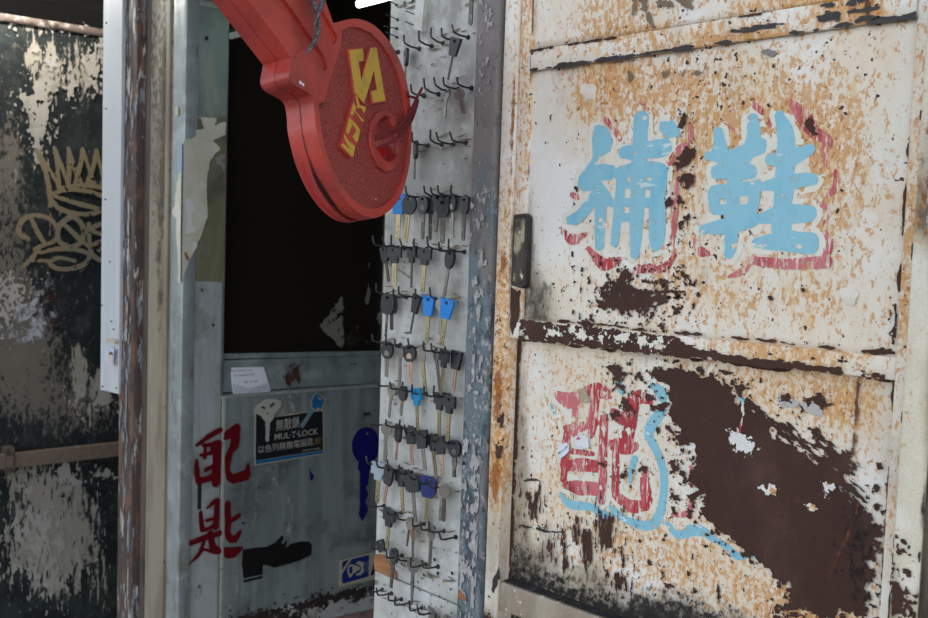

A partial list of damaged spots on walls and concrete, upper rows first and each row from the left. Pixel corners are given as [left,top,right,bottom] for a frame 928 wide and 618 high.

peeling [7,22,103,170]
peeling [0,270,53,350]
peeling [0,461,118,617]
peeling [62,296,131,443]
peeling [458,434,481,618]
peeling [464,243,487,395]
corrosion [490,445,503,503]
corrosion [493,364,504,428]
peeling [508,255,919,618]
corrosion [729,363,791,372]
corrosion [850,376,902,456]
corrosion [879,522,894,618]